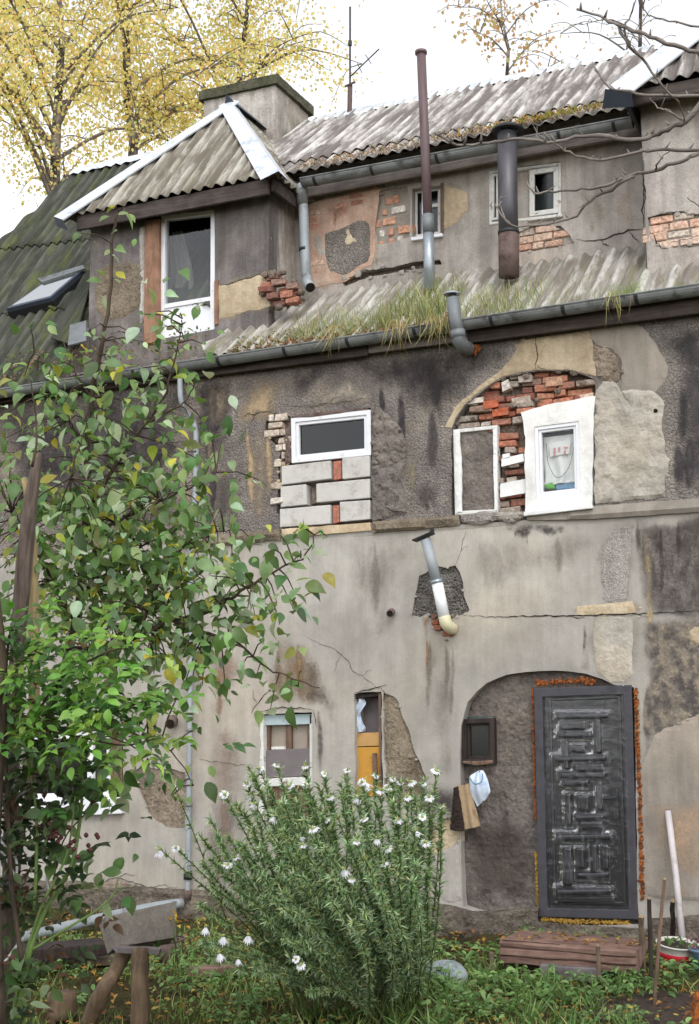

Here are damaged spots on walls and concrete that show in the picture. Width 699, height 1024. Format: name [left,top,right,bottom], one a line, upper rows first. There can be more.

peeling [218,184,442,319]
flaking render [519,225,574,253]
flaking render [642,209,699,249]
flaking render [441,330,624,519]
spalling [410,566,469,641]
crack [476,610,699,619]
damp [636,518,699,621]
crack [311,639,385,700]
spalling [380,693,426,804]
spalling [136,766,186,829]